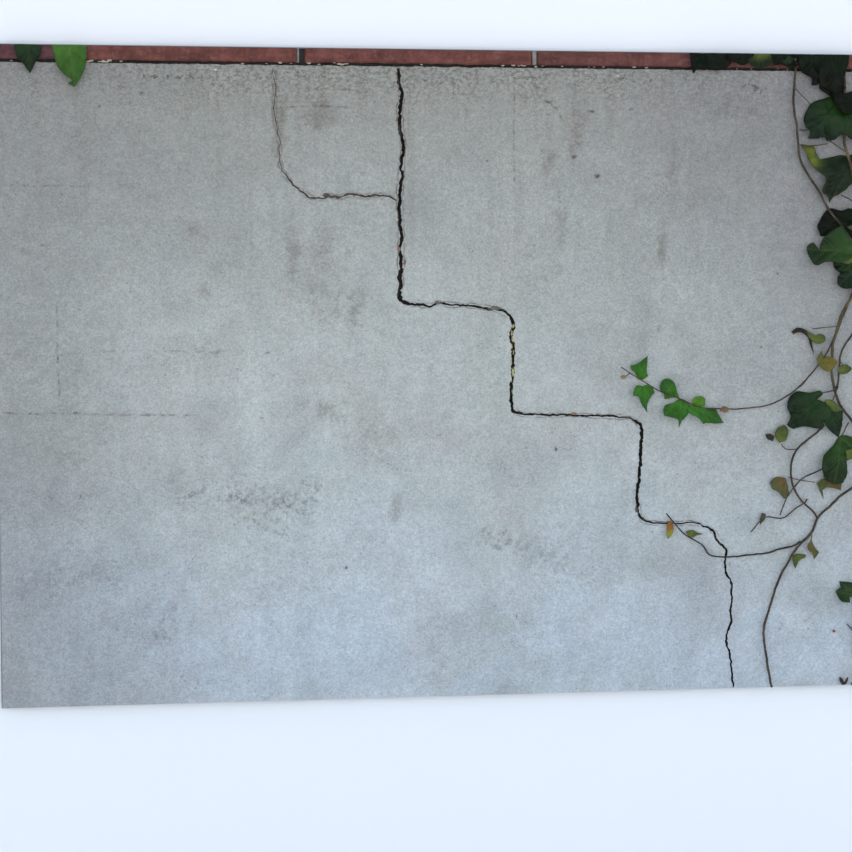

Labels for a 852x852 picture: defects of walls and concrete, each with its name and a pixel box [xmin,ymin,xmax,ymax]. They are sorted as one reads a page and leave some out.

crack [272,68,734,687]